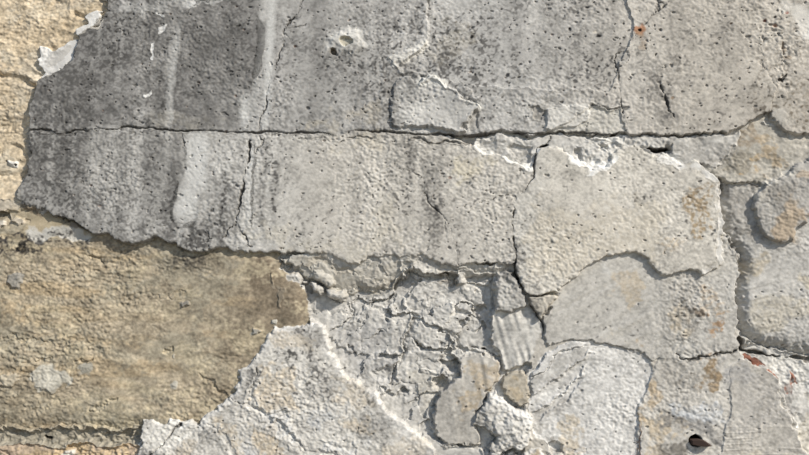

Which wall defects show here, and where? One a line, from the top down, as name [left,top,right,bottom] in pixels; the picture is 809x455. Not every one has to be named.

peeling [37,0,109,81]
flaking render [386,39,430,74]
rust [632,23,648,51]
spalling [6,128,94,245]
leakage [27,59,103,209]
leakage [133,0,282,252]
crack [28,0,728,333]
crack [438,326,502,360]
crack [675,235,809,365]
crack [437,438,482,447]